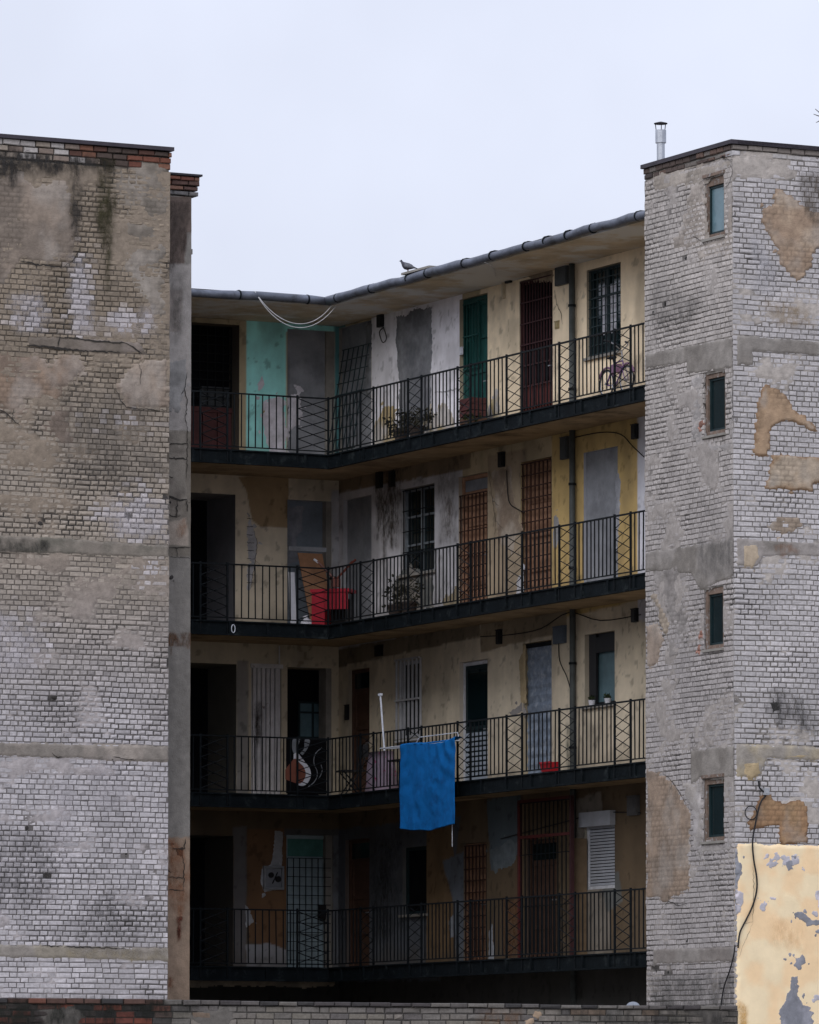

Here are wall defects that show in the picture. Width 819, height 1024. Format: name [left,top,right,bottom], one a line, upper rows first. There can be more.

damp [0,150,116,262]
flaking render [760,189,819,282]
crack [27,337,188,518]
flaking render [751,384,819,494]
peeling [260,831,283,898]
flaking render [646,768,745,914]
flaking render [747,793,809,871]
peeling [791,890,819,937]
peeling [779,953,819,1024]